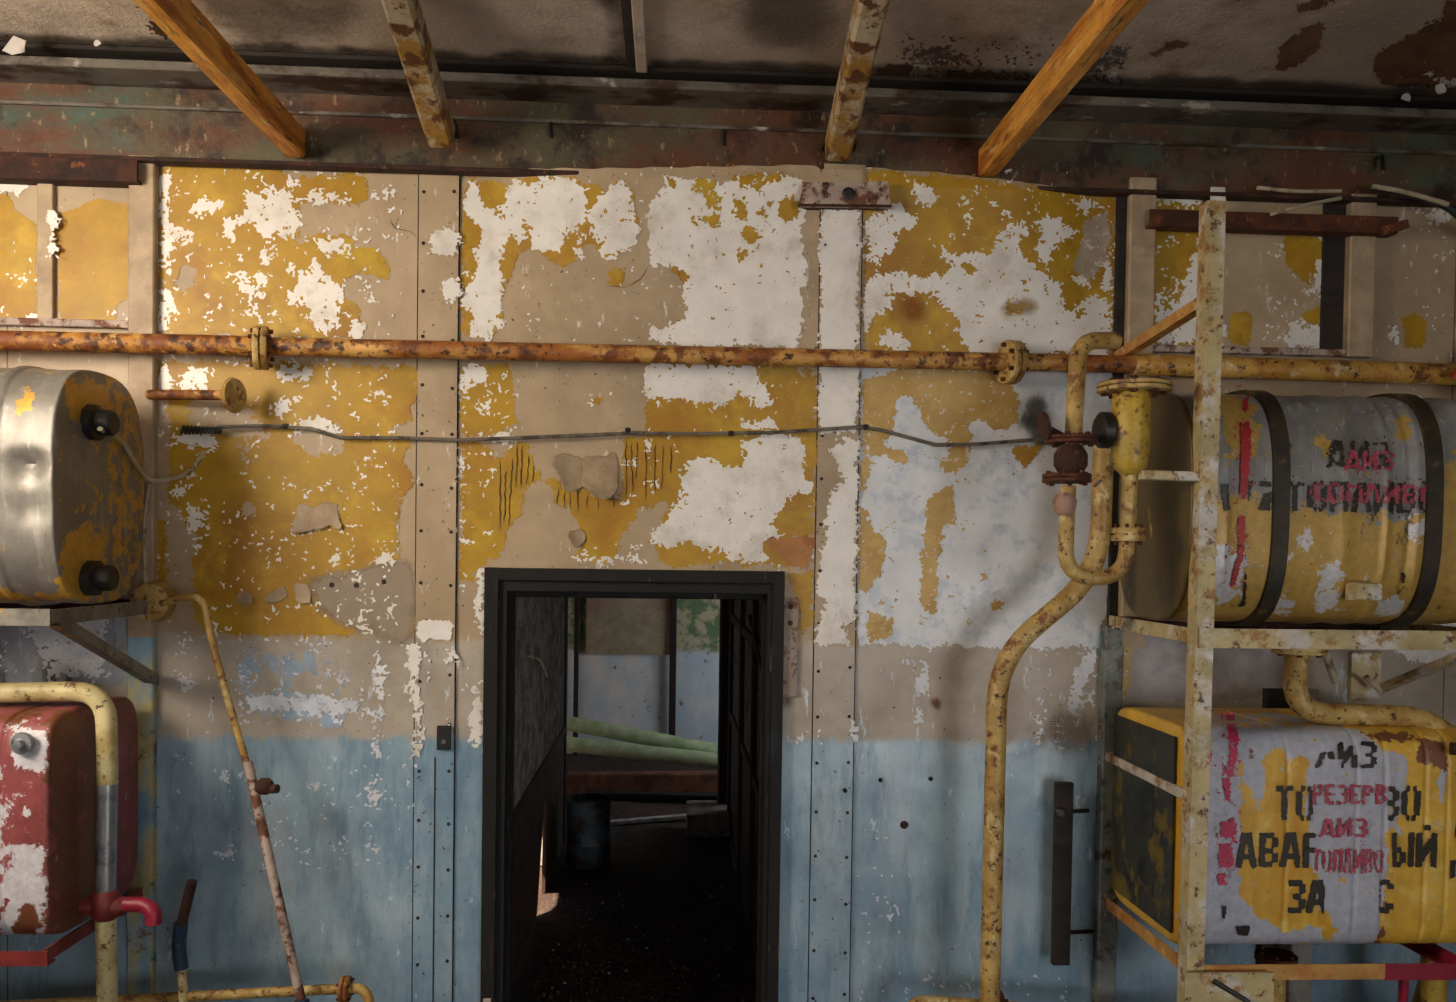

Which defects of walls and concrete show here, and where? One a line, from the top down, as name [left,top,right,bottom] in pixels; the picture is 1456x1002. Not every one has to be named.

water stain [0,34,179,48]
water stain [233,44,399,57]
water stain [434,51,627,66]
water stain [652,61,840,74]
water stain [871,66,1037,81]
water stain [1078,74,1456,98]
peeling [0,184,128,329]
peeling [158,166,403,339]
peeling [427,162,1116,750]
peeling [157,354,483,869]
peeling [858,867,900,944]